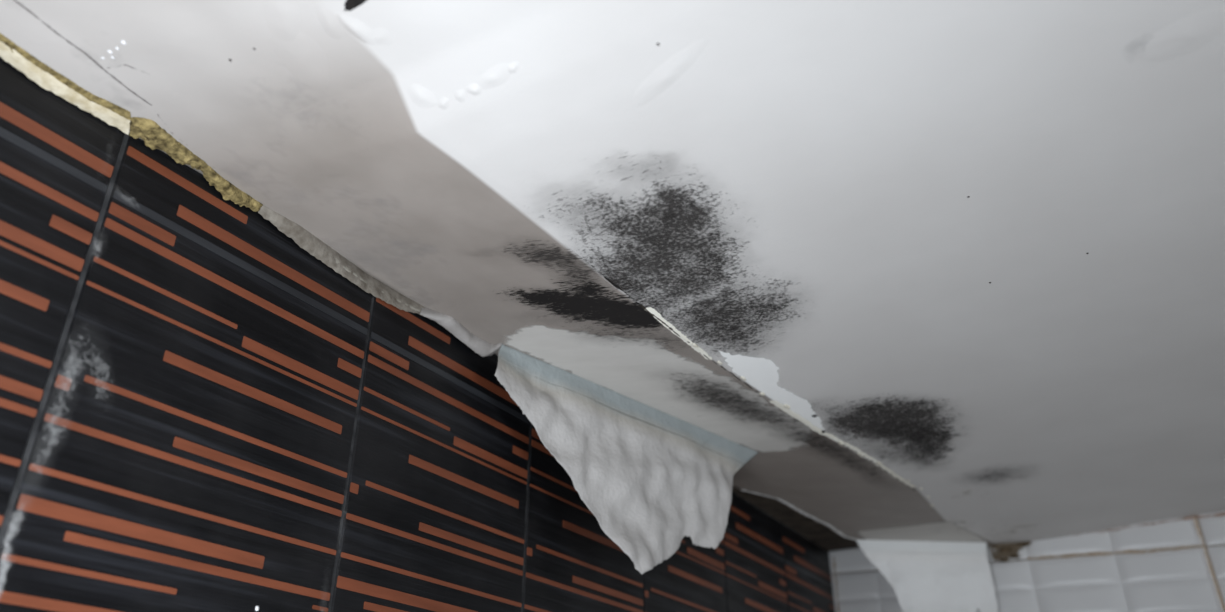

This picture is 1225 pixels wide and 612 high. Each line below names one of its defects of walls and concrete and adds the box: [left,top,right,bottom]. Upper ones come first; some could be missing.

peeling [0,33,825,574]
mould [498,183,794,352]
mould [675,374,957,475]
peeling [856,522,998,612]